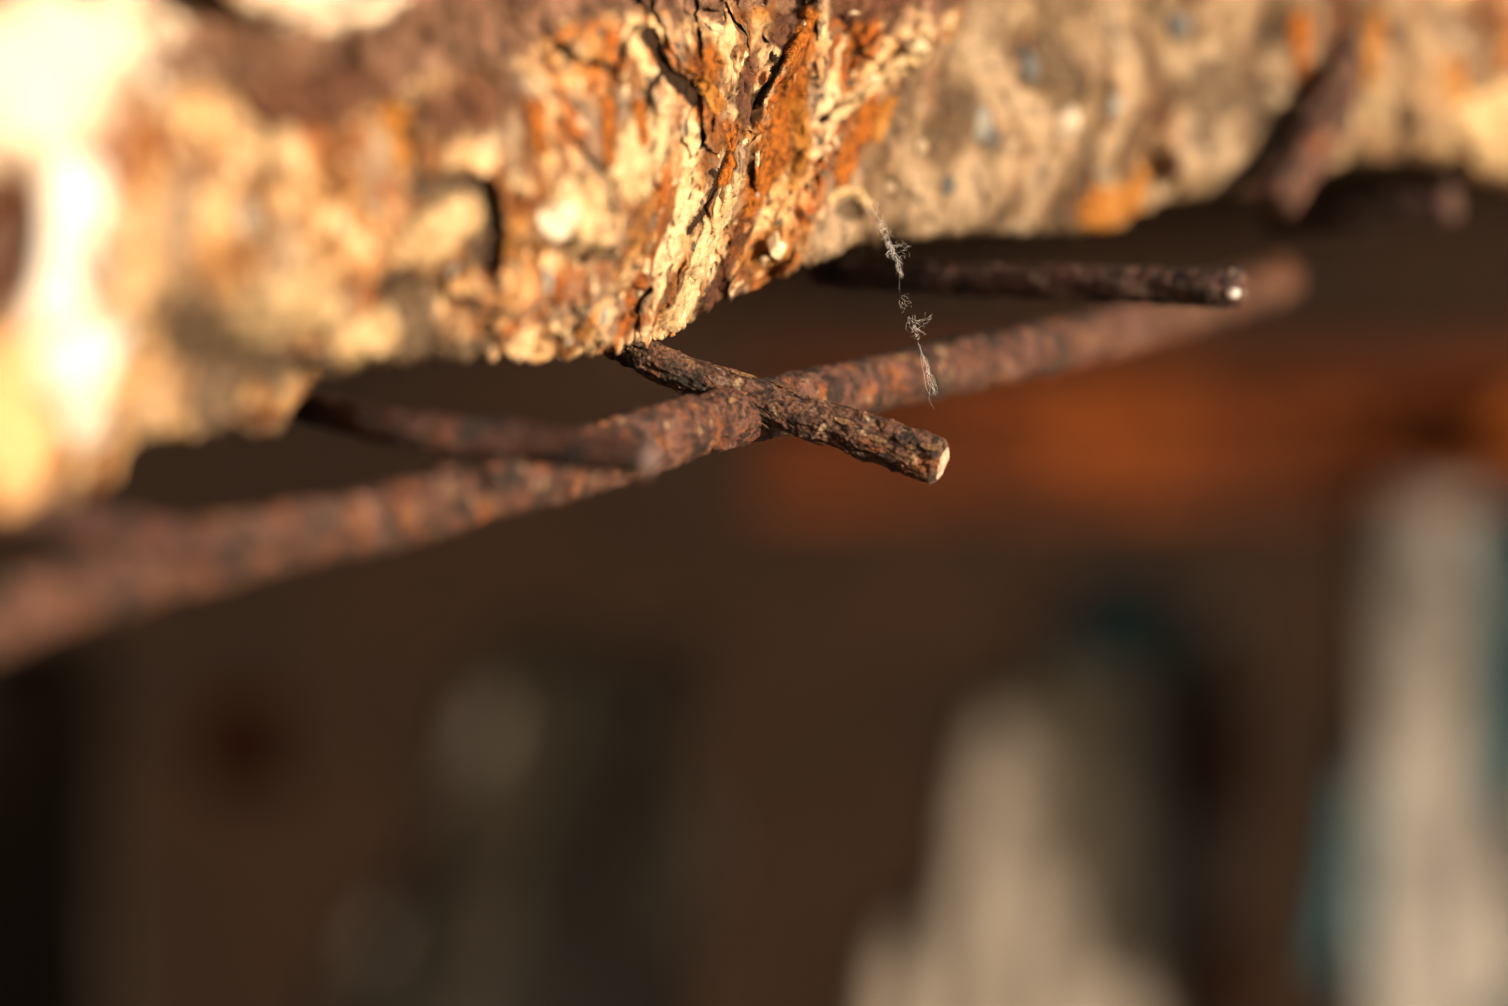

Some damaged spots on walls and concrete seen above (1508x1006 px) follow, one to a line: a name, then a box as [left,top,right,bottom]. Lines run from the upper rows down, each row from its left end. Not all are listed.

rust [225,60,549,171]
peeling [401,193,484,262]
spalling [538,102,675,253]
rust [601,95,650,170]
crack [637,25,705,114]
crack [686,146,729,236]
spalling [661,151,786,337]
crack [752,18,801,110]
rust [689,0,911,282]
spalling [829,36,933,123]
peeling [1227,288,1240,298]
rust [0,171,80,513]